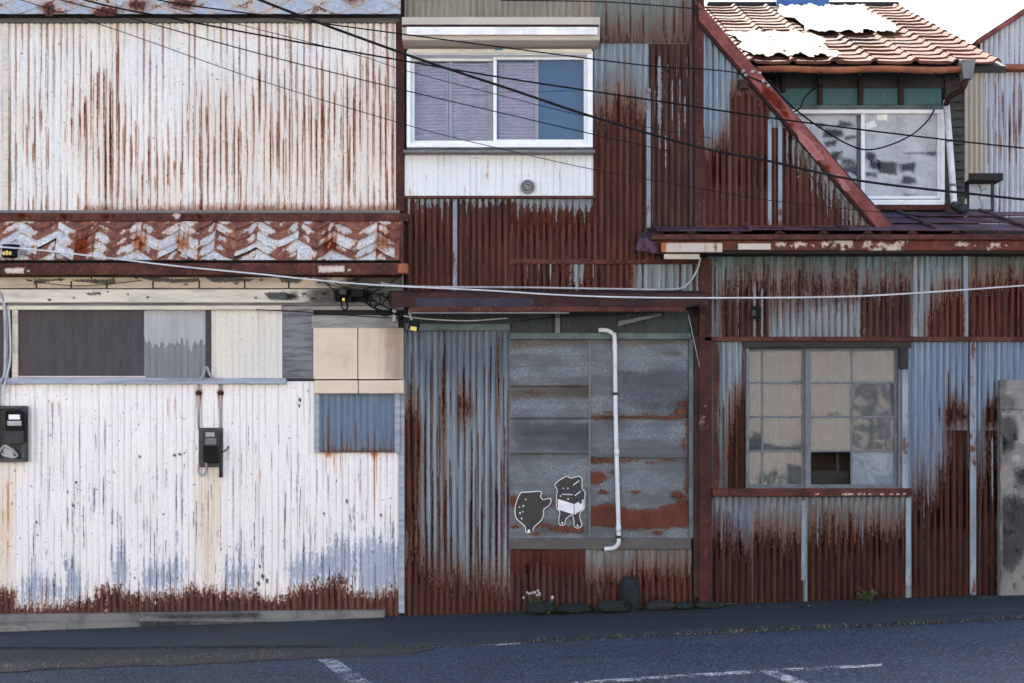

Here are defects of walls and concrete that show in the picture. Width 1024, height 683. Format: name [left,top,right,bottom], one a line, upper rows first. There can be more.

rust [406,25,692,291]
rust [704,85,858,225]
rust [721,265,911,337]
rust [928,270,1024,337]
rust [0,398,691,616]
rust [712,374,998,603]